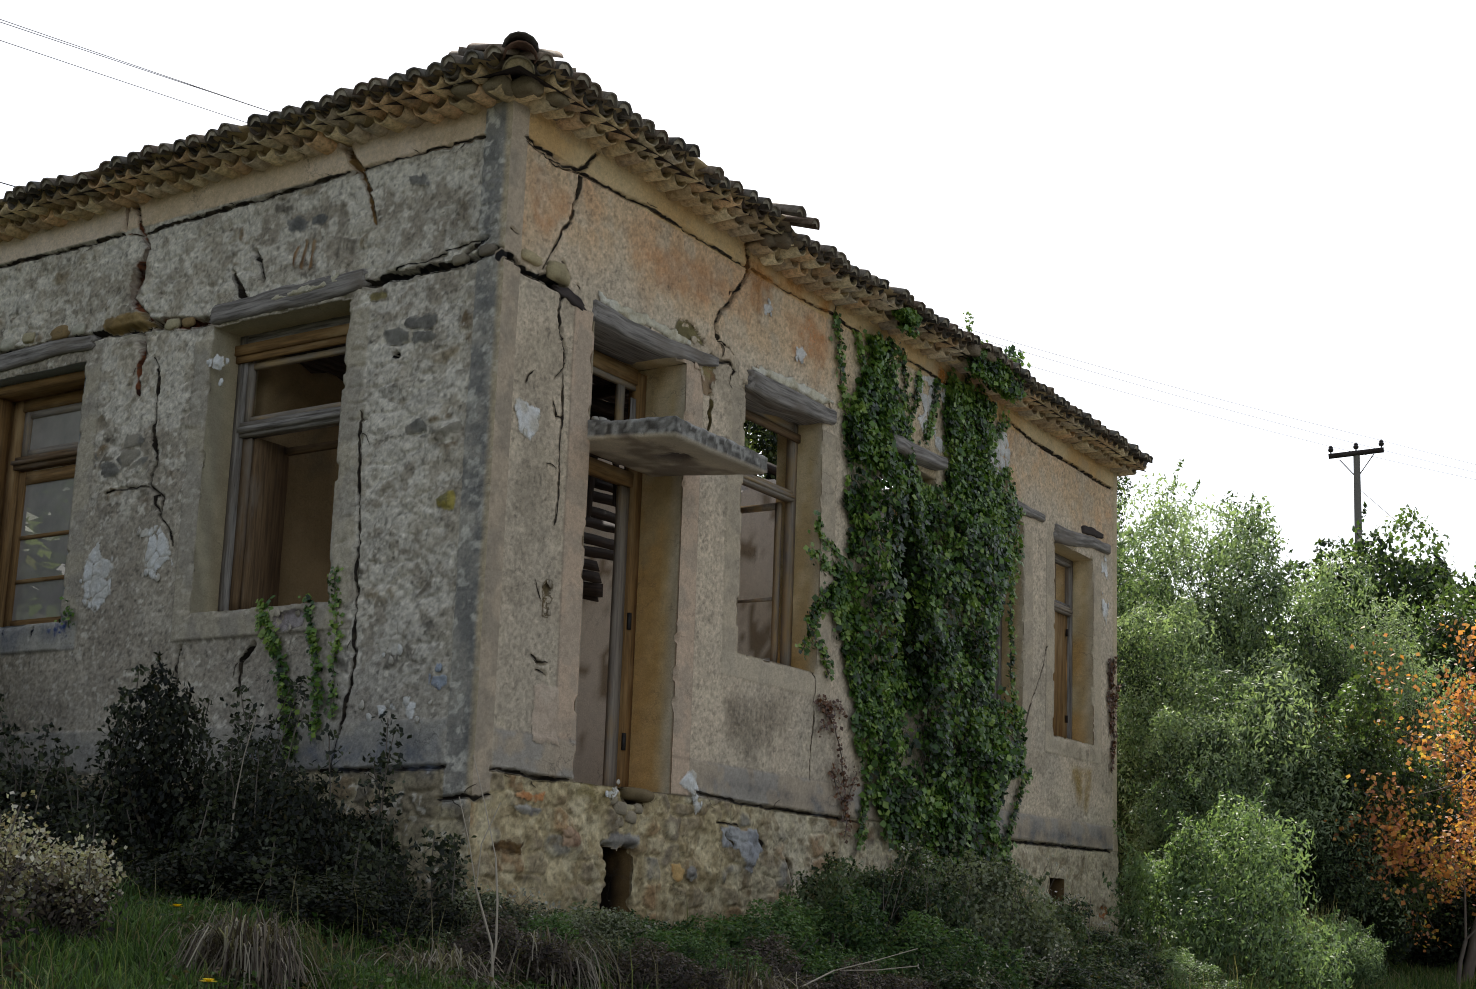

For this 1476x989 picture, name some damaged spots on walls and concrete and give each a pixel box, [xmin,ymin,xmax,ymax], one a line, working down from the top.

crack [0,135,486,546]
crack [365,136,863,525]
crack [898,354,947,385]
peeling [79,541,114,614]
peeling [136,525,173,582]